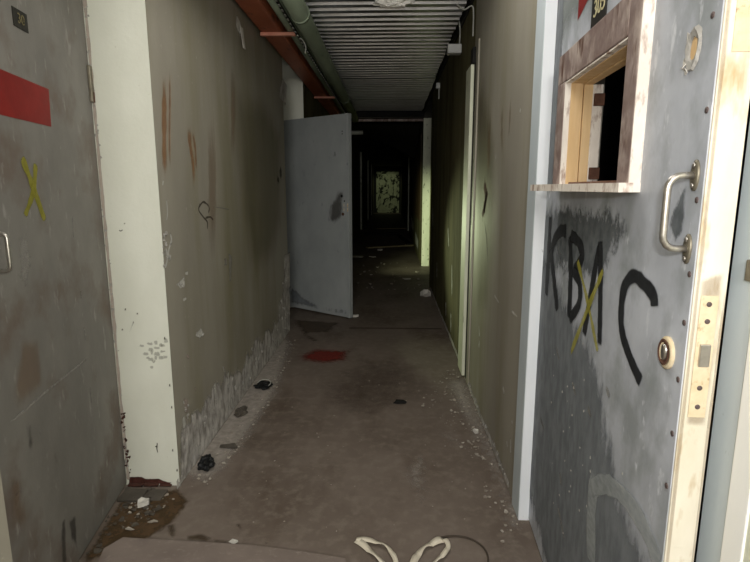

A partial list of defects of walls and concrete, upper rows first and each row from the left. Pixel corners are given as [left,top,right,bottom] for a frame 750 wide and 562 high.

rust [162,84,171,164]
peeling [117,259,290,508]